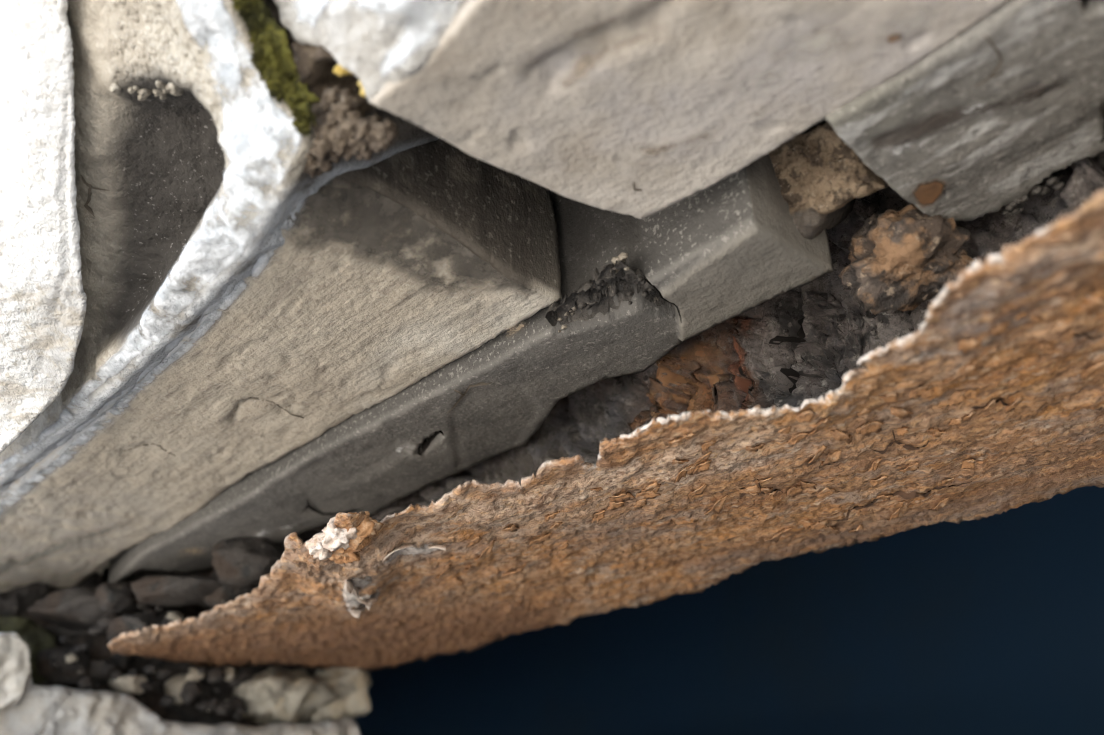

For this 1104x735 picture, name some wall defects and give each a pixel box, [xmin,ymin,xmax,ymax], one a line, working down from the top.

spalling [545,252,681,332]
rust [800,181,975,377]
rust [628,317,776,429]
rust [778,312,1042,469]
rust [590,481,661,524]
rust [668,433,716,497]
rust [704,477,836,515]
peeling [382,542,453,562]
peeling [343,577,380,618]
spalling [0,635,31,708]